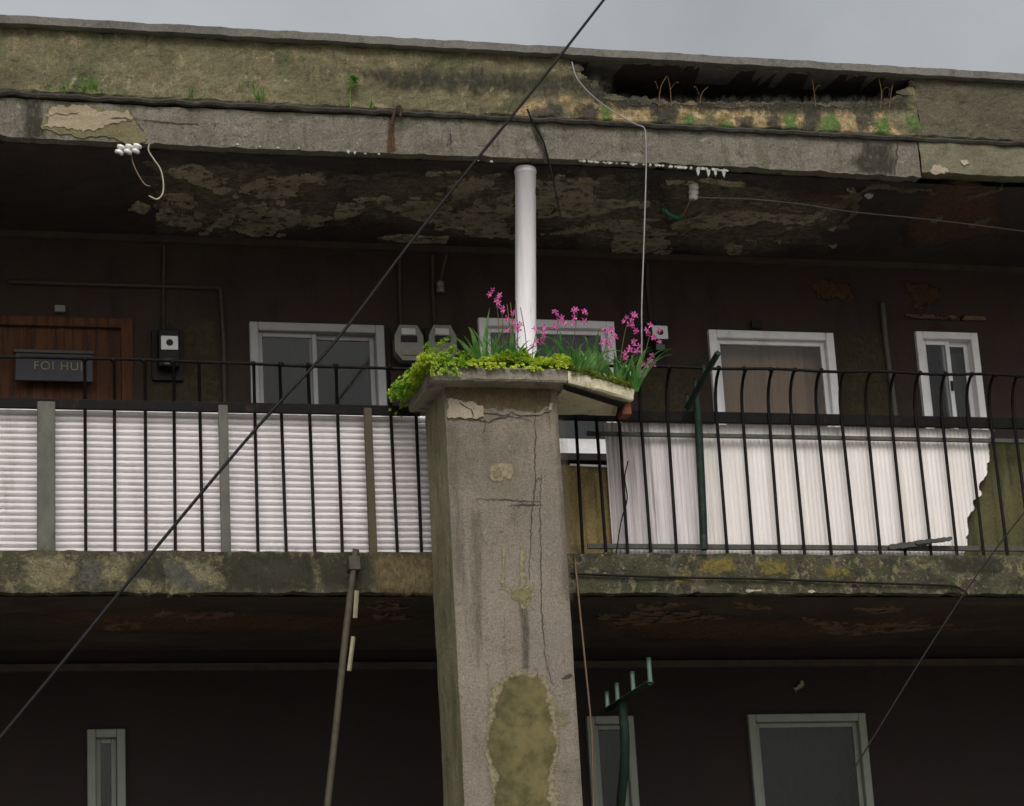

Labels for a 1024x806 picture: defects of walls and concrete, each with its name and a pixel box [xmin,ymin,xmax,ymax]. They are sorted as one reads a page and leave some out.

peeling [40,104,147,144]
damp [362,70,906,162]
spalling [515,63,919,136]
damp [856,144,893,173]
peeling [128,160,515,244]
peeling [536,160,936,257]
damp [20,552,77,591]
damp [56,553,398,634]
crack [448,407,572,686]
spalling [484,669,560,806]